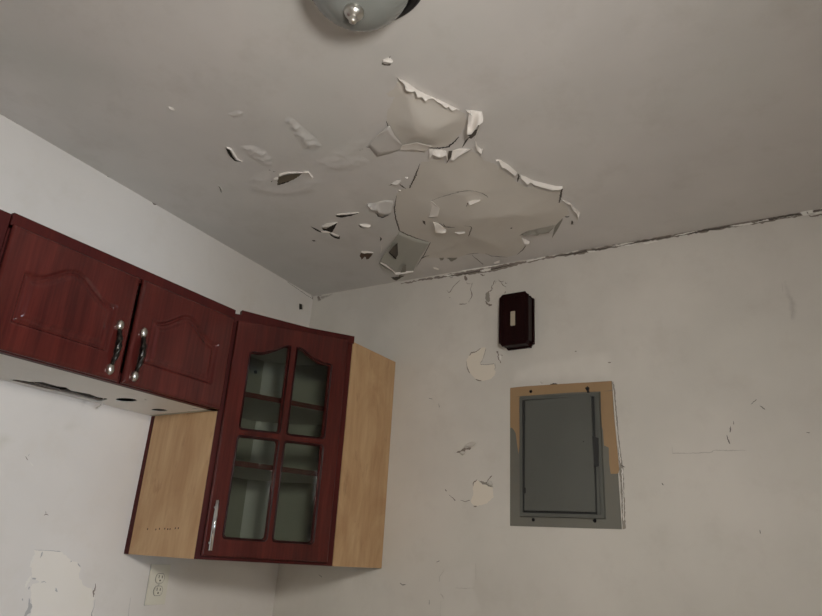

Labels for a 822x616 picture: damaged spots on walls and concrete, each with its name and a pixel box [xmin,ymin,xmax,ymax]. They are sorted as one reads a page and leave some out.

peeling [270,170,313,185]
peeling [367,77,580,270]
peeling [312,212,359,241]
crack [401,208,822,284]
peeling [22,550,96,616]